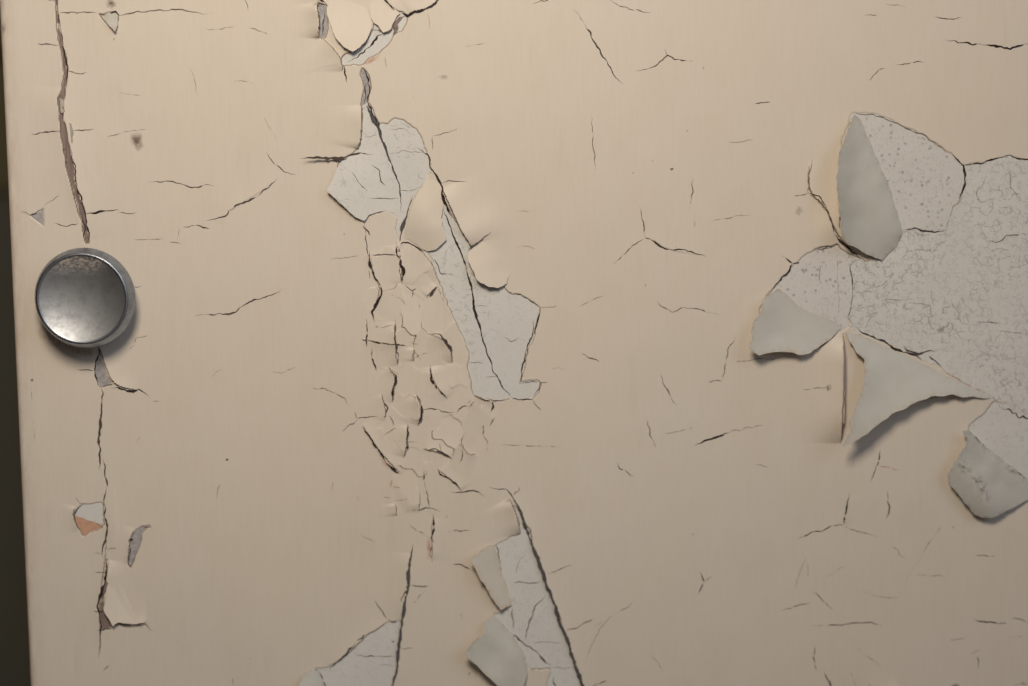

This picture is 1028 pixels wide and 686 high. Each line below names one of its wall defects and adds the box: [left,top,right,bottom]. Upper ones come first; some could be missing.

crack [57,7,69,80]
peeling [318,0,437,82]
crack [578,14,686,79]
crack [938,17,1024,50]
crack [70,148,90,242]
crack [136,122,290,244]
peeling [300,103,555,411]
peeling [749,113,1028,518]
crack [313,226,561,562]
peeling [95,553,151,657]
peeling [299,546,426,686]
peeling [454,487,605,686]